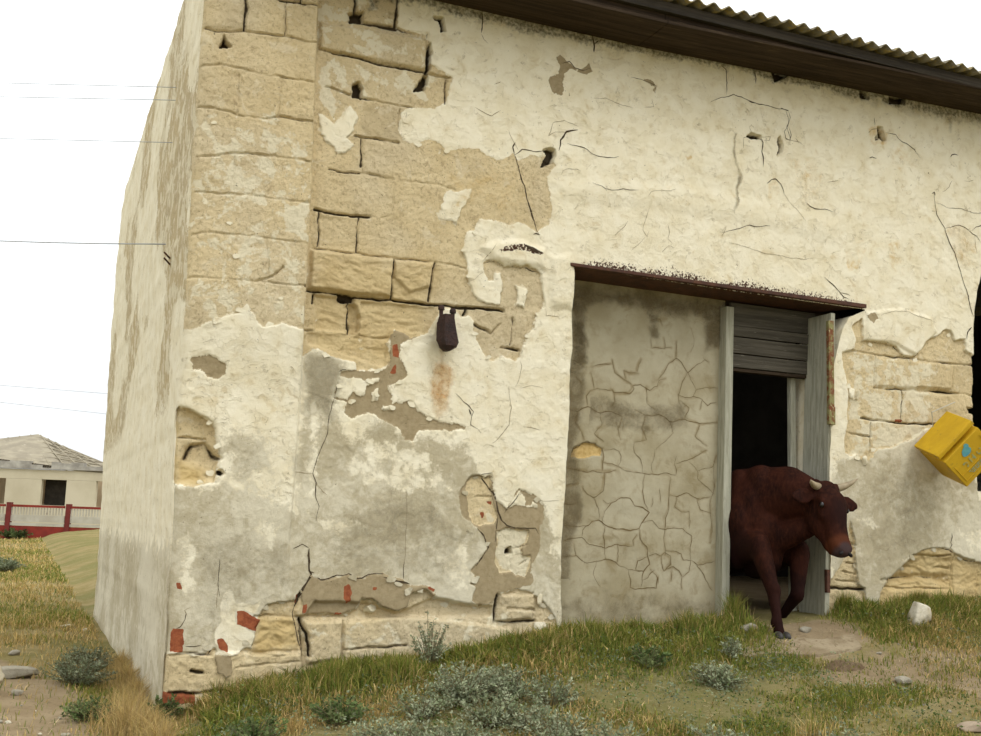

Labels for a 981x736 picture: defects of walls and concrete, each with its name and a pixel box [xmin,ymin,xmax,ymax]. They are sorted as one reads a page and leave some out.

spalling [183,0,557,444]
peeling [547,53,594,98]
crack [475,107,675,252]
crack [711,66,830,221]
crack [932,180,981,335]
spalling [174,403,223,490]
spalling [569,442,604,460]
crack [461,320,716,590]
spalling [841,310,974,465]
crack [292,491,409,646]
spalling [162,471,557,719]
spalling [829,517,981,612]